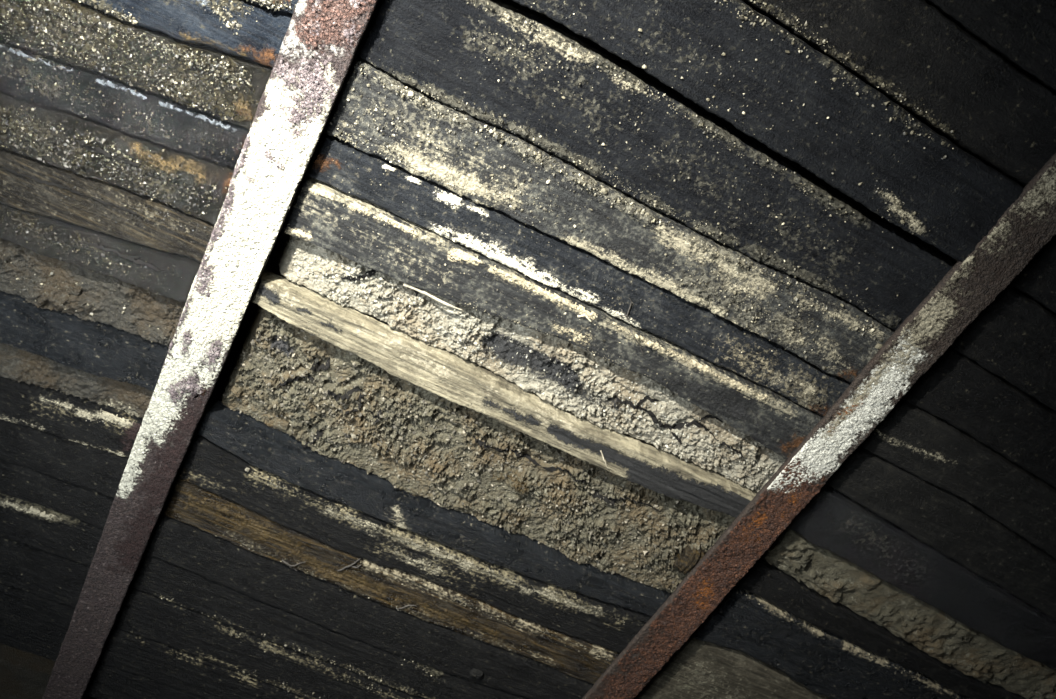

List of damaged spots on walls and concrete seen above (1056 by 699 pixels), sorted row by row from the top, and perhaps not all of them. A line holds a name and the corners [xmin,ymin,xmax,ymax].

damp [0,45,73,72]
corrosion [242,0,377,139]
damp [96,79,235,131]
damp [130,142,218,184]
damp [310,186,336,200]
damp [381,144,523,217]
corrosion [168,134,253,357]
damp [284,228,312,241]
damp [346,202,816,405]
damp [795,294,884,339]
damp [779,318,850,373]
corrosion [592,435,826,699]